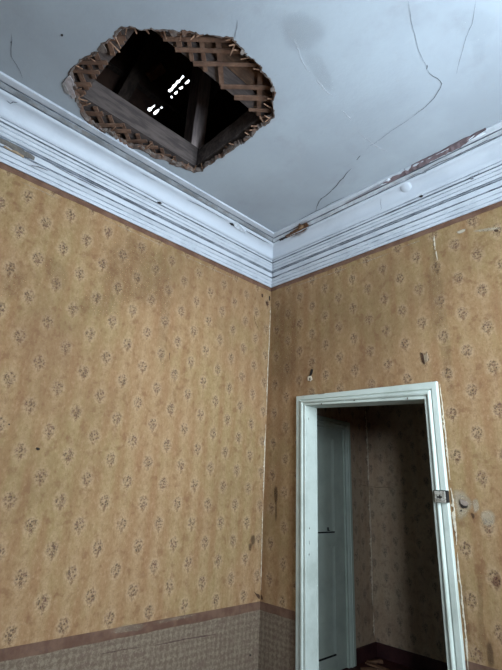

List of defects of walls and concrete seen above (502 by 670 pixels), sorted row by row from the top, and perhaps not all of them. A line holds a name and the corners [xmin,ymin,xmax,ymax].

peeling [62,75,77,99]
crack [305,172,360,229]
peeling [380,128,487,185]
crack [379,134,502,211]
spalling [279,223,309,241]